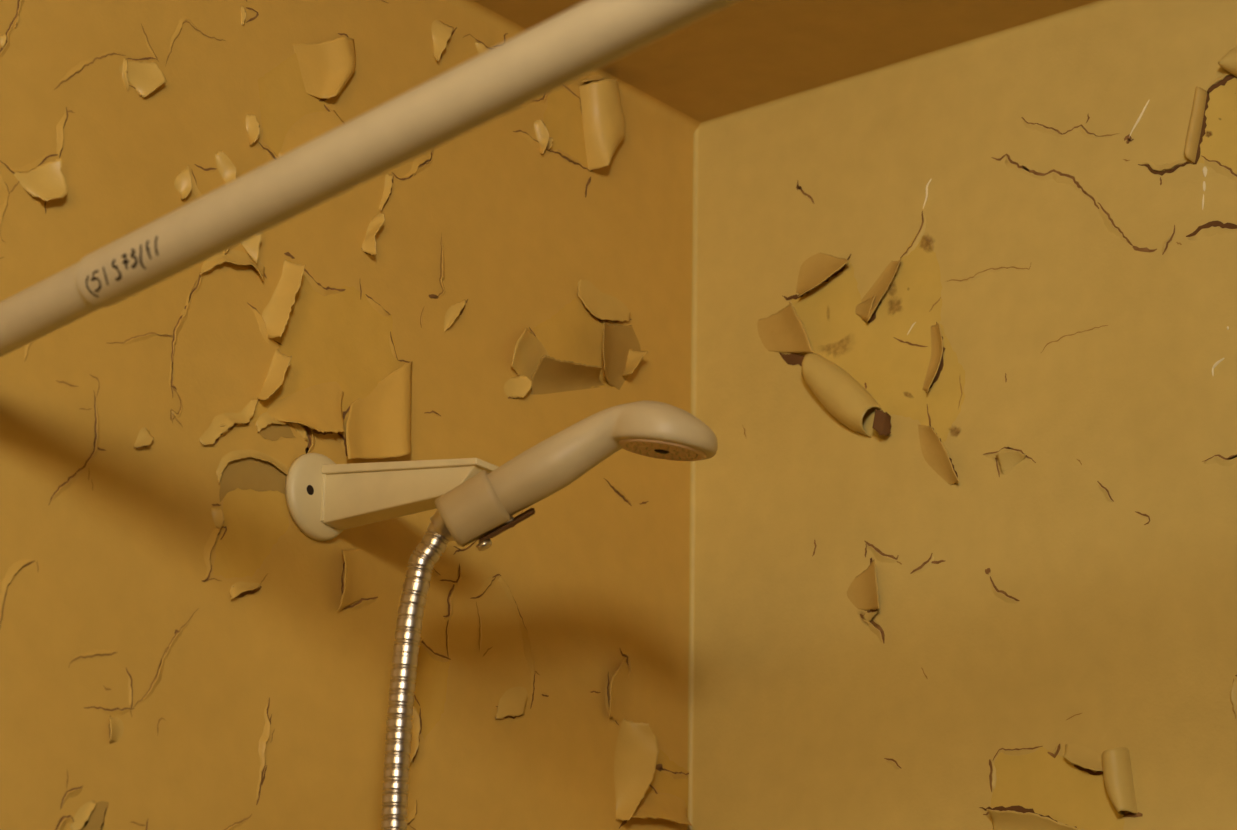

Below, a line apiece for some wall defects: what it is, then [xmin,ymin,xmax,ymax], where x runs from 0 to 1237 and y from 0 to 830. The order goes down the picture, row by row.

crack [0,0,25,60]
peeling [245,33,356,159]
peeling [513,75,625,197]
crack [1021,113,1120,139]
crack [991,154,1237,255]
peeling [503,280,649,399]
peeling [757,179,965,485]
peeling [164,233,412,599]
crack [1202,454,1237,466]
crack [69,608,199,733]
crack [431,538,548,719]
peeling [979,744,1143,830]